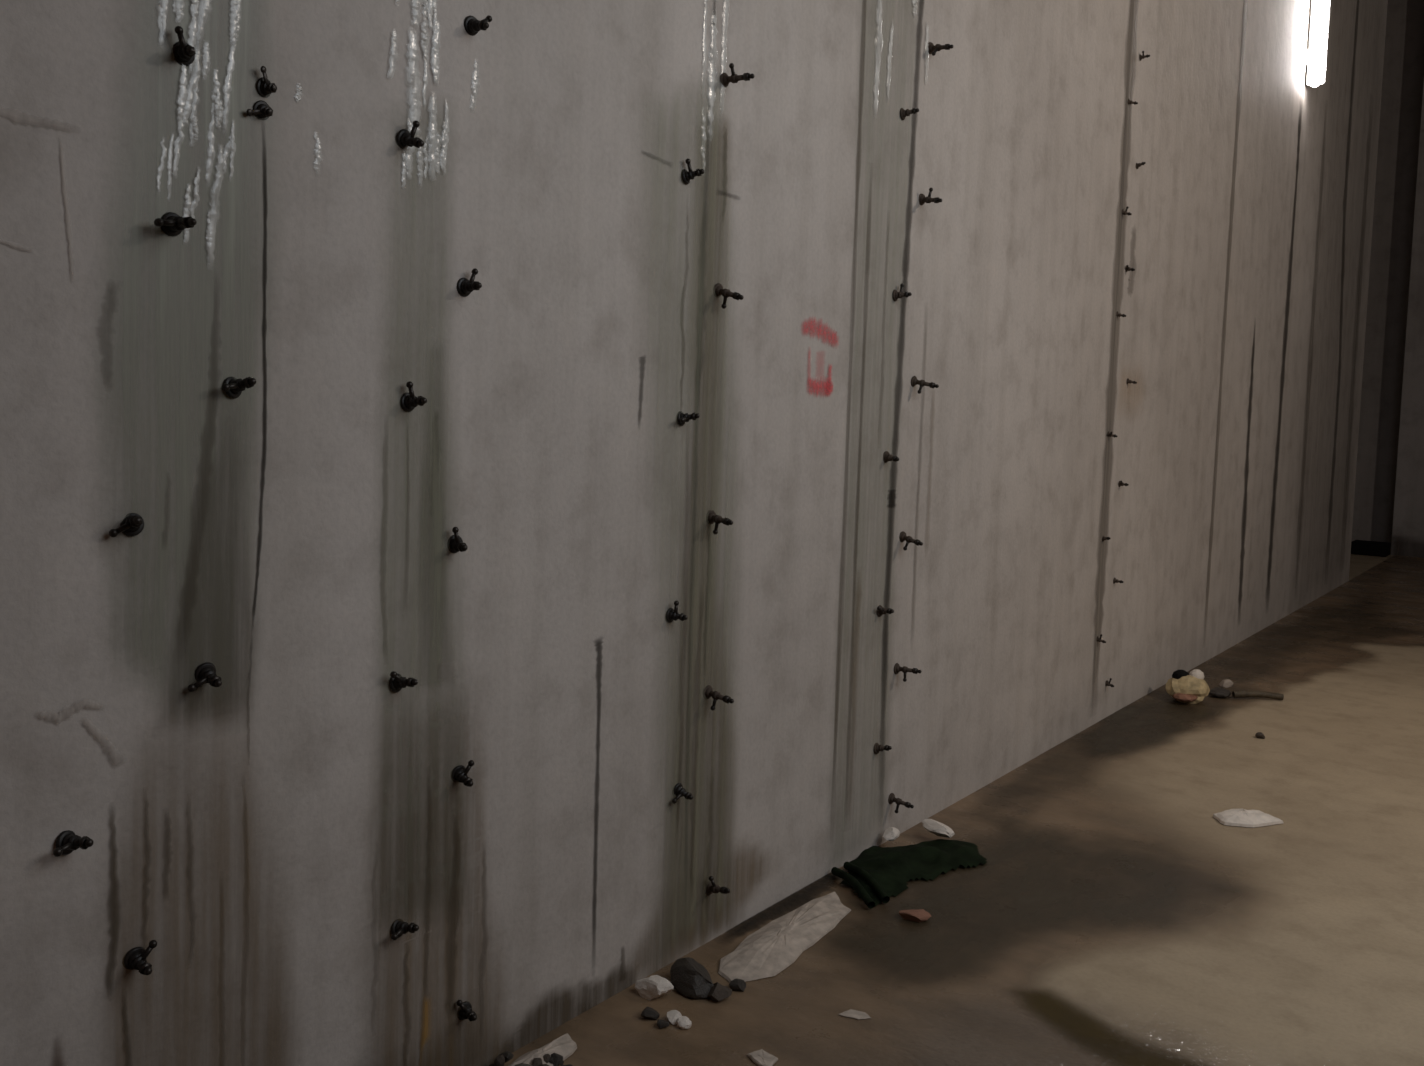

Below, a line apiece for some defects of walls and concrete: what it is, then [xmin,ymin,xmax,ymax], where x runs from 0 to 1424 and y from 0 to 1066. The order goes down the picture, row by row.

water stain [122,0,254,704]
crack [253,155,267,613]
water stain [314,134,322,171]
water stain [388,0,449,199]
water stain [471,62,480,110]
crack [884,0,924,693]
water stain [504,0,1424,1066]
crack [1094,0,1138,679]
water stain [108,822,119,984]
crack [594,641,602,929]